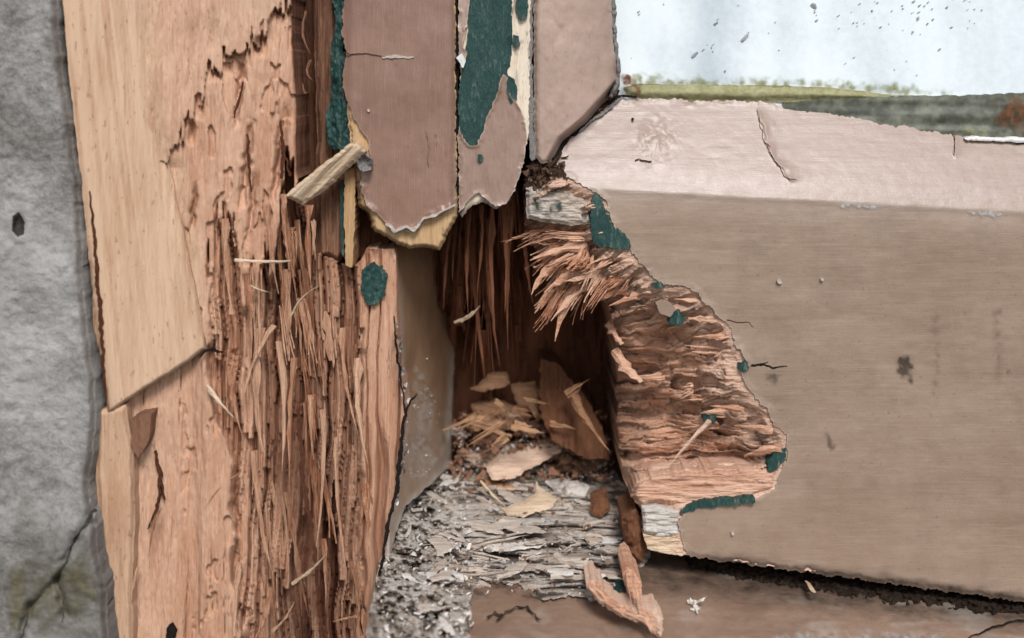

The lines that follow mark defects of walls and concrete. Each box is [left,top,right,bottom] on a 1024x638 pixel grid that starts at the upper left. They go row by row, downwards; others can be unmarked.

peeling [515,0,529,21]
peeling [507,76,518,104]
crack [233,81,252,192]
crack [279,121,291,179]
crack [757,110,796,180]
peeling [655,299,675,317]
crack [738,361,787,369]
crack [147,450,166,530]
crack [21,508,97,638]